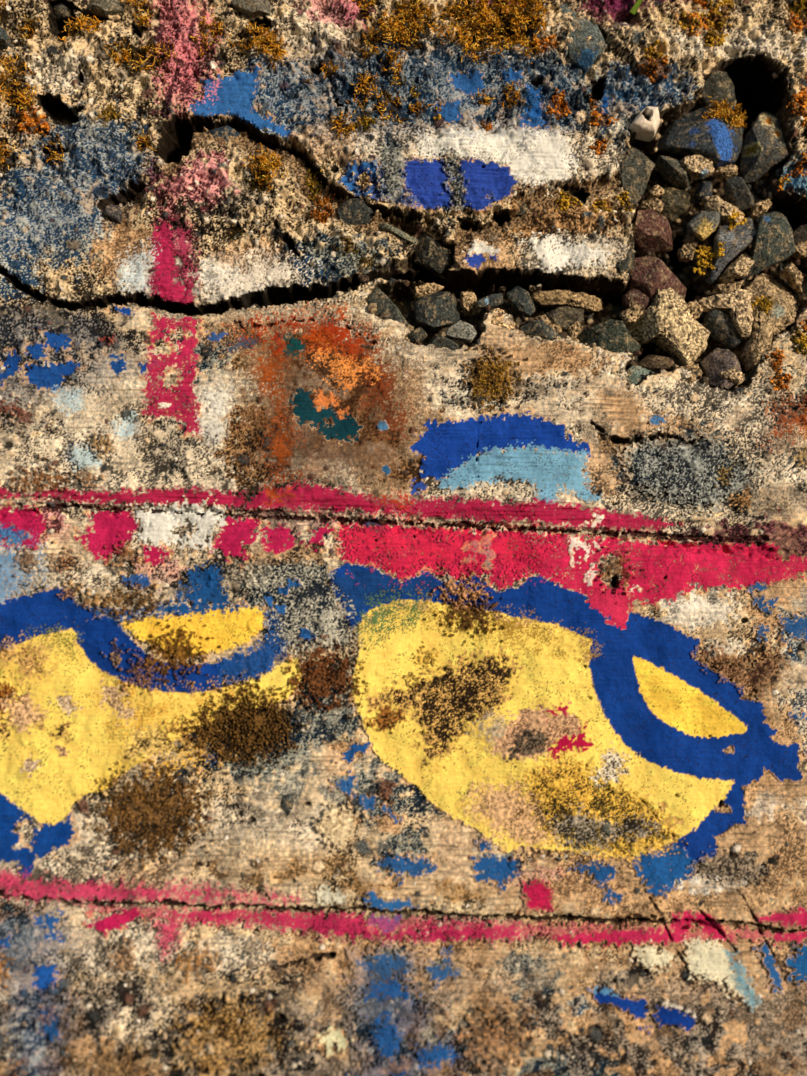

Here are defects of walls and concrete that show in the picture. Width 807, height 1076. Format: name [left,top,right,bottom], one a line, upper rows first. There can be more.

peeling [500,67,543,87]
peeling [431,98,464,125]
spalling [590,78,614,114]
spalling [563,187,590,204]
crack [0,115,624,329]
hole [457,219,483,231]
hole [493,209,511,226]
spalling [623,52,807,392]
spalling [369,234,556,348]
spalling [559,277,630,346]
crack [70,891,807,971]